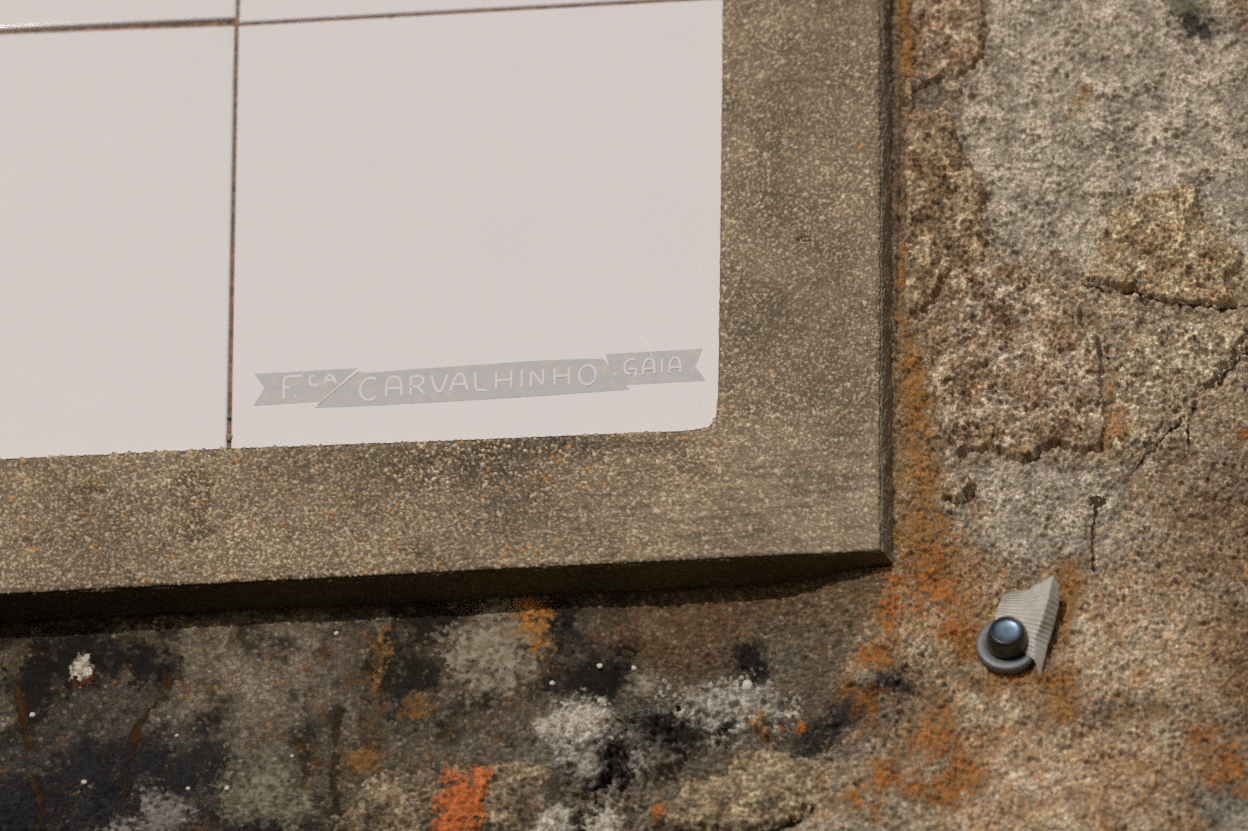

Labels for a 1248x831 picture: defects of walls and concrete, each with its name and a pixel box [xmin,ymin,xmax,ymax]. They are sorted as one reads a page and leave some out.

crack [1081,282,1248,312]
crack [1122,346,1248,482]
crack [1090,499,1098,571]
water stain [0,619,183,740]
water stain [0,708,327,831]
water stain [361,596,921,831]